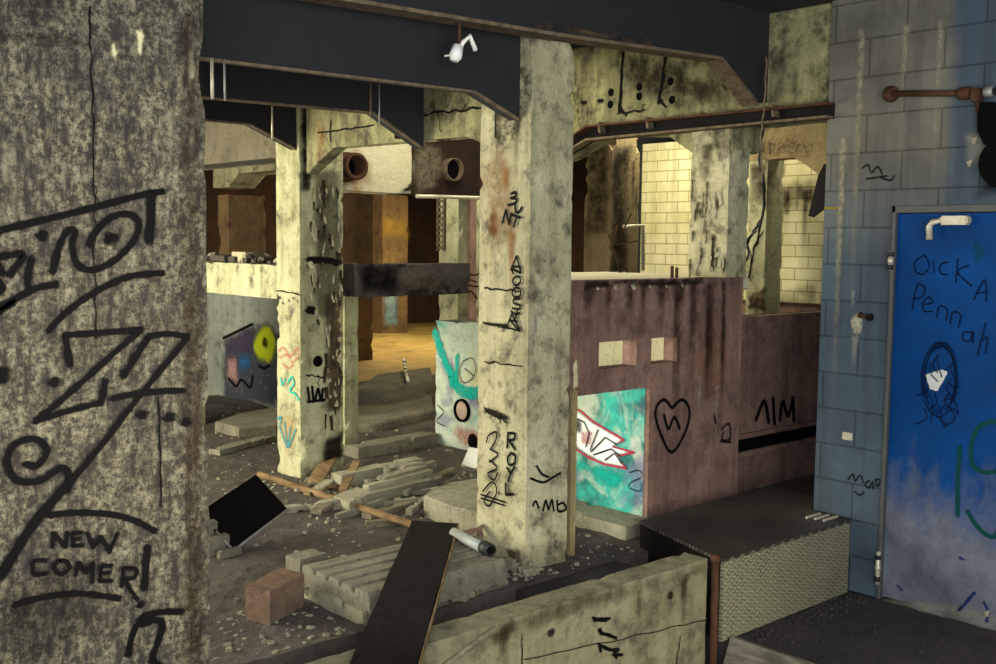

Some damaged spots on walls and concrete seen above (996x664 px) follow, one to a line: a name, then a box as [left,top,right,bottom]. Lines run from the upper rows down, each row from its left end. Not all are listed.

crack [424,98,481,132]
peeling [279,173,343,461]